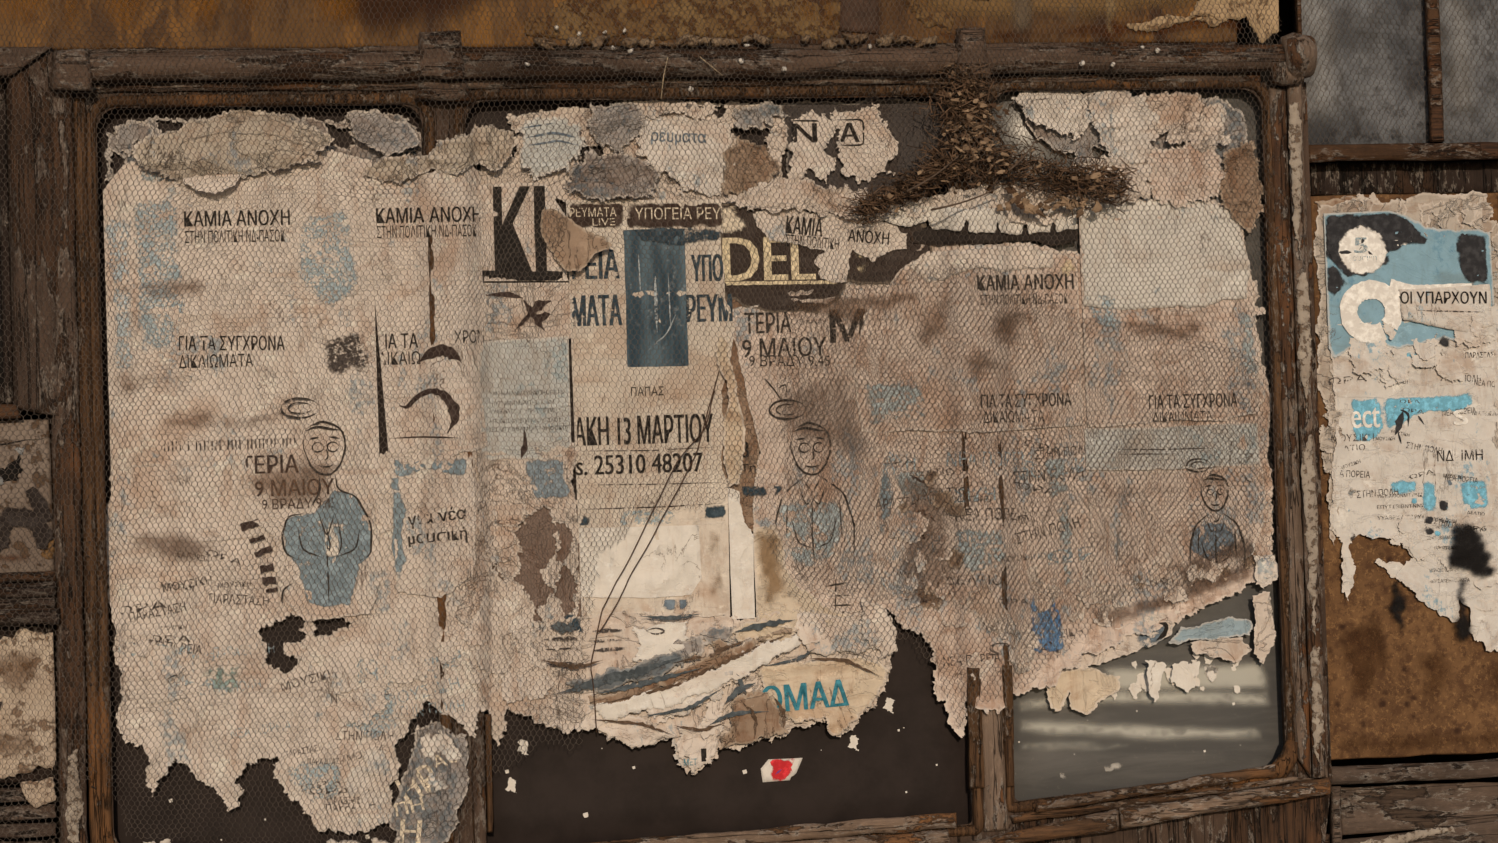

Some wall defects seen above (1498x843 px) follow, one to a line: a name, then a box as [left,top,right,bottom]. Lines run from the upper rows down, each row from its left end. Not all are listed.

peeling [524,0,955,51]
flaking render [1127,0,1279,43]
peeling [0,627,84,843]